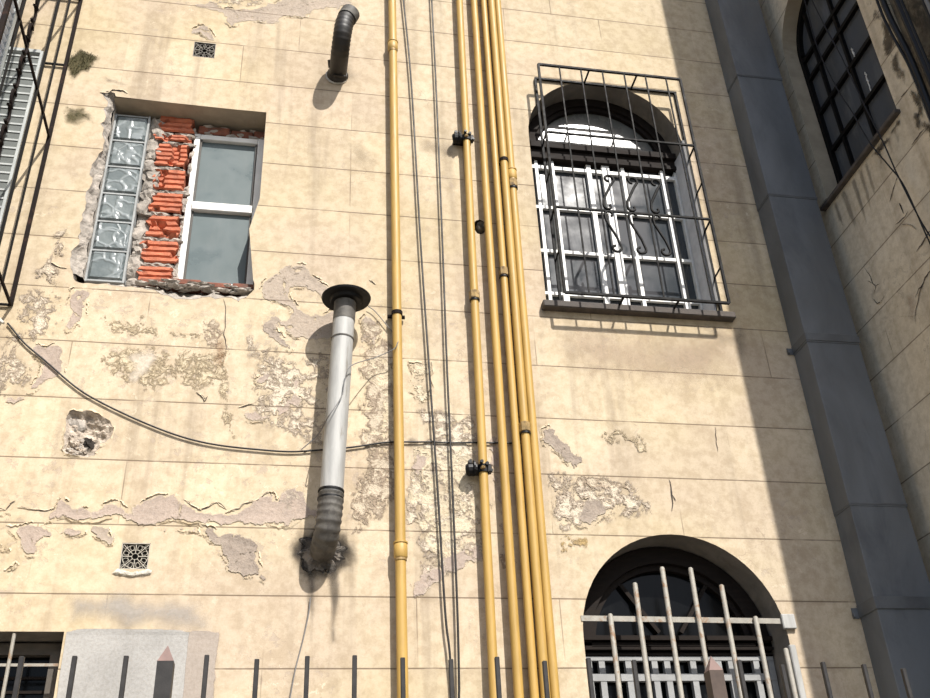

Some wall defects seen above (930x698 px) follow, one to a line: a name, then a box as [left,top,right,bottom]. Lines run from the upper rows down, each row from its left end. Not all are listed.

peeling [186,0,353,28]
crack [890,178,930,252]
peeling [0,229,90,404]
peeling [99,262,334,445]
spalling [60,408,115,458]
peeling [351,313,394,534]
peeling [405,361,504,598]
peeling [539,424,651,531]
peeling [0,488,317,585]